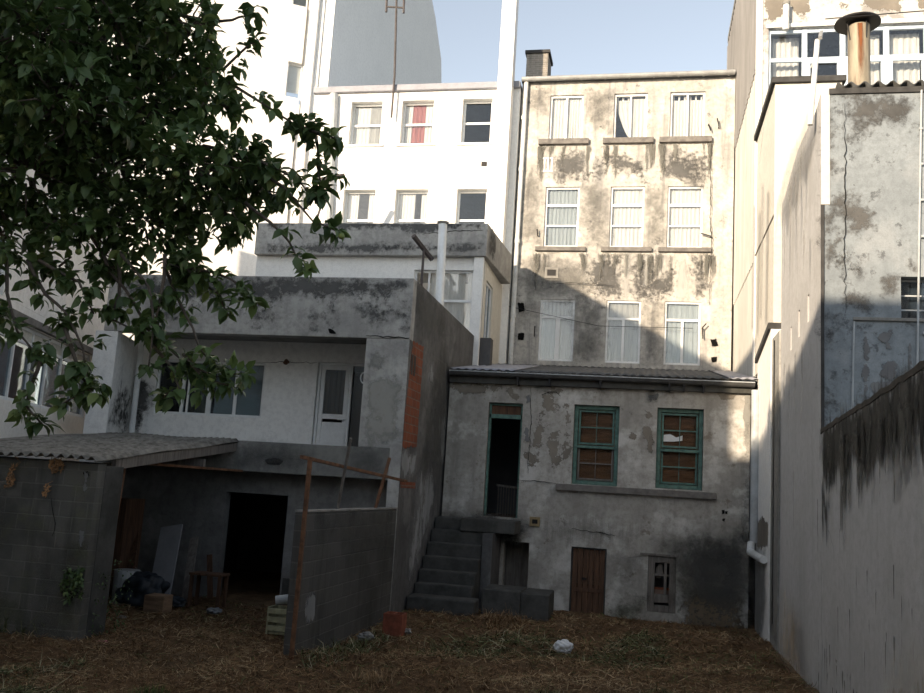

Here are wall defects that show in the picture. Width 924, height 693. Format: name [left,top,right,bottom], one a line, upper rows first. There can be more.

peeling [764,0,810,22]
peeling [860,0,902,12]
water stain [537,143,713,225]
crack [841,107,849,313]
water stain [121,276,411,333]
water stain [526,253,715,299]
flaking render [403,341,424,448]
peeling [523,386,574,468]
peeling [629,390,659,453]
water stain [817,357,924,541]
water stain [677,533,765,637]